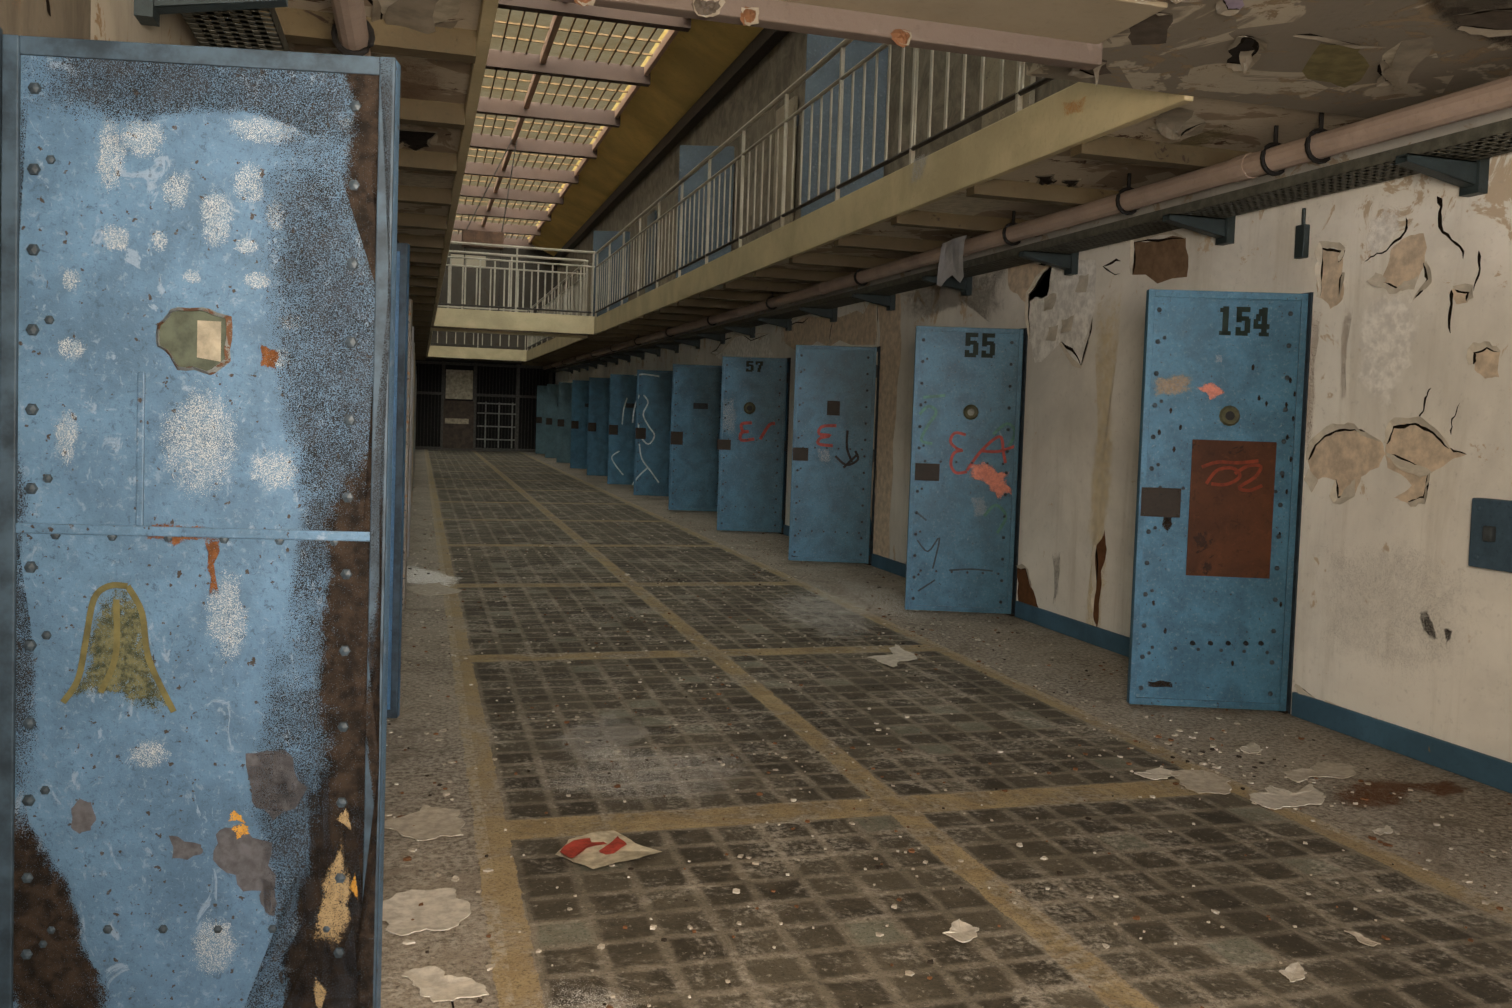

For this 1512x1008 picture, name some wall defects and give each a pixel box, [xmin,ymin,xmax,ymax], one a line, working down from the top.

peeling [1128,0,1184,45]
peeling [1215,0,1244,16]
peeling [1453,8,1512,37]
peeling [1068,59,1112,87]
peeling [1226,35,1267,74]
peeling [1302,37,1433,91]
peeling [1129,231,1188,284]
peeling [1367,233,1432,300]
peeling [1449,283,1473,304]
peeling [1304,416,1466,507]